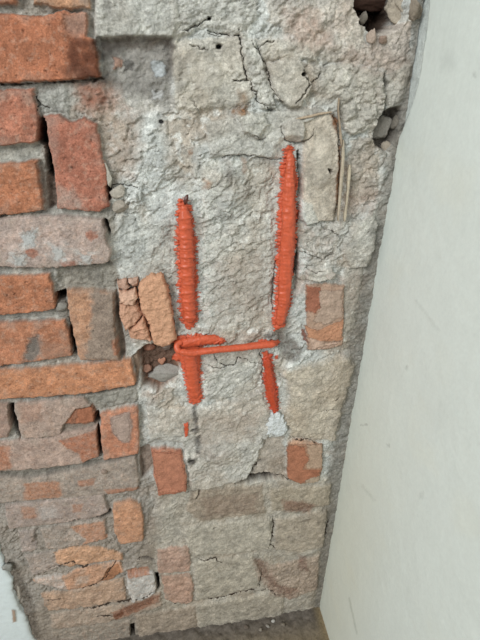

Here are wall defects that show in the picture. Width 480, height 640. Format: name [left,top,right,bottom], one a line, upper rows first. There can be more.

spalling [355,10,381,30]
spalling [151,61,166,77]
crack [183,19,279,109]
spalling [70,405,99,424]
spalling [110,412,133,443]